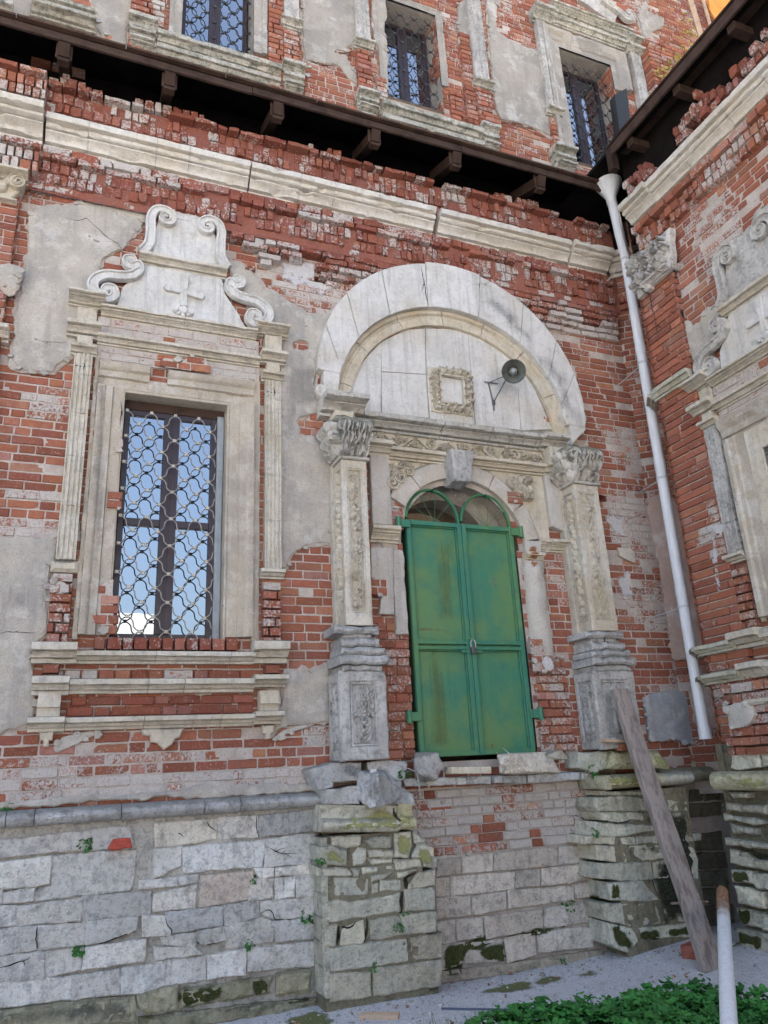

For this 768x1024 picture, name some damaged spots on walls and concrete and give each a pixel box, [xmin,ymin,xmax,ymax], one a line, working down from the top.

flaking render [485,0,551,140]
flaking render [0,199,147,376]
flaking render [270,662,332,741]
flaking render [53,730,103,753]
mould [672,816,694,876]
mould [655,864,683,924]